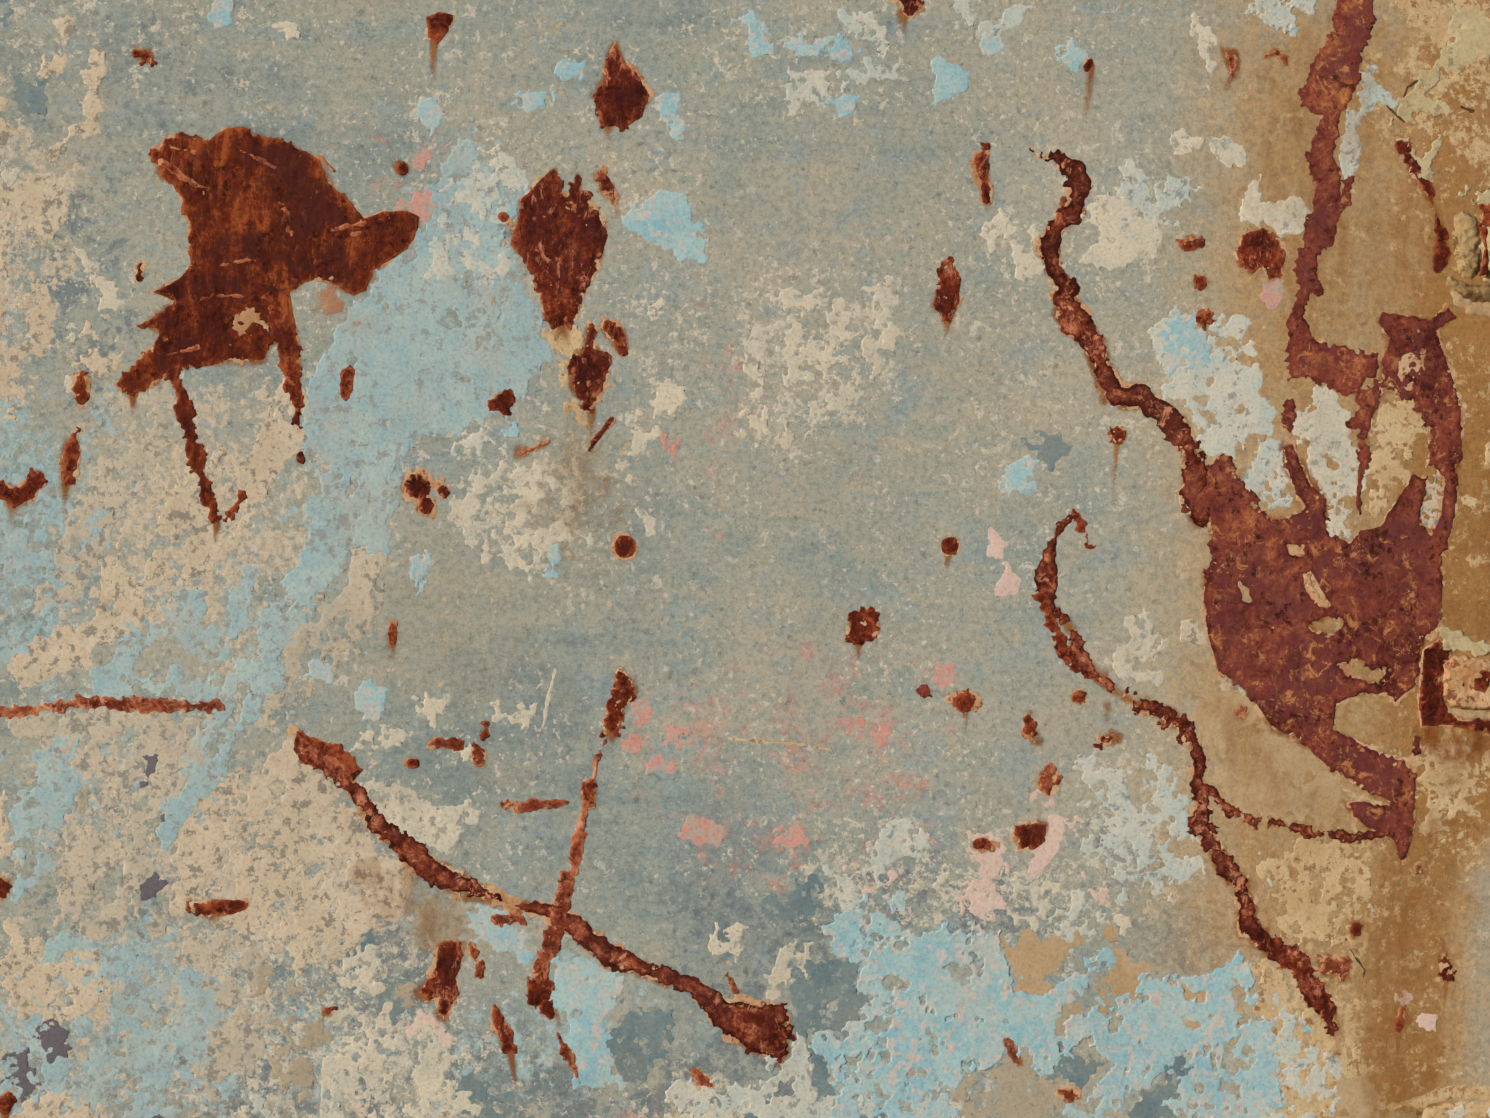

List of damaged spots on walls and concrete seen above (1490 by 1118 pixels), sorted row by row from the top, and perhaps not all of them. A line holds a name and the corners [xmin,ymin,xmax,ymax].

peeling [0,15,125,427]
corrosion [114,127,419,535]
corrosion [498,165,628,424]
corrosion [593,41,656,134]
peeling [731,8,900,122]
peeling [1170,128,1312,238]
peeling [1147,304,1441,539]
corrosion [1174,0,1490,875]
corrosion [0,694,226,719]
peeling [0,137,676,1118]
corrosion [415,940,486,1022]
peeling [664,753,1386,1118]